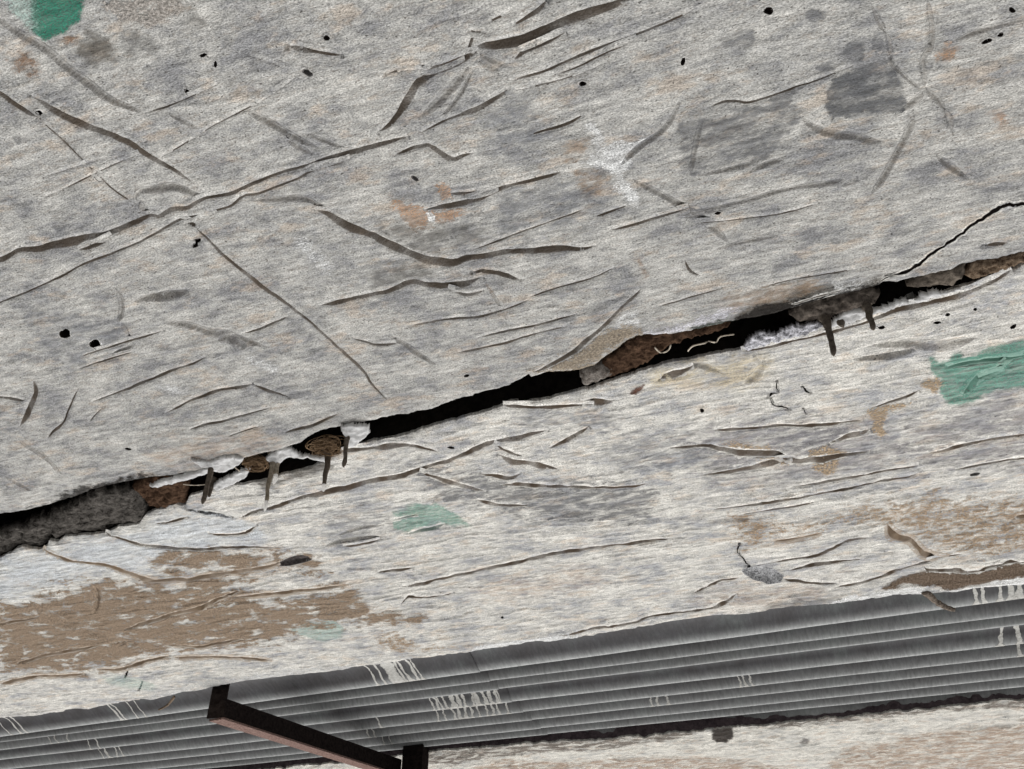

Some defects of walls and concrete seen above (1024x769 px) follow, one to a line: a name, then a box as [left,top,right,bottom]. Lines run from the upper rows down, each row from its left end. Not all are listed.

water stain [743,286,961,351]
crack [768,382,810,414]
crack [187,507,231,520]
crack [736,545,749,565]